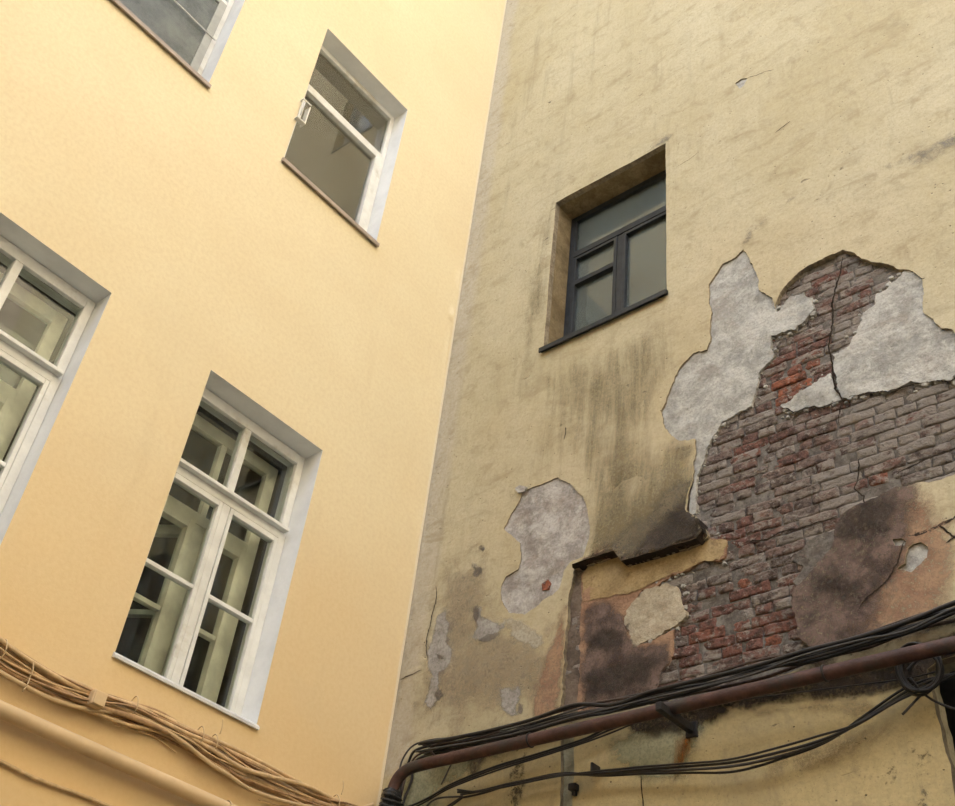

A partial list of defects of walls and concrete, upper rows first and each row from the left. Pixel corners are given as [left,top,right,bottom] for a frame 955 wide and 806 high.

damp [591,446,707,565]
flaking render [473,252,955,715]
damp [837,500,895,540]
damp [851,497,953,638]
crack [857,516,955,612]
peeling [425,612,452,708]
damp [584,654,660,698]